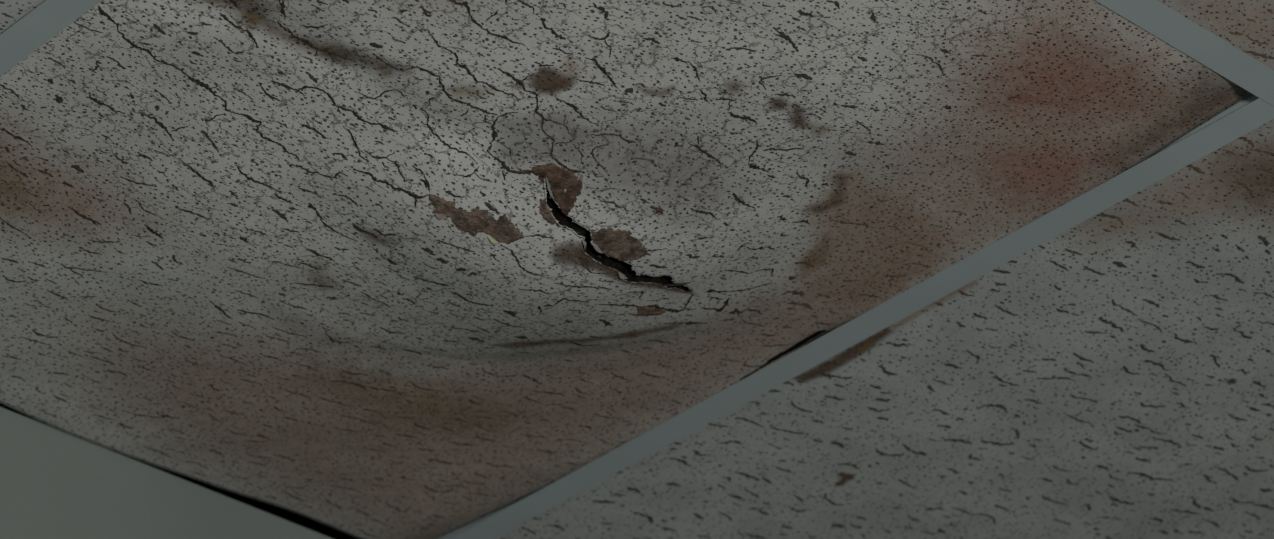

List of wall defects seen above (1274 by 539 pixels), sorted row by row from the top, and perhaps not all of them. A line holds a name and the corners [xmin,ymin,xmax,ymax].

water stain [294,39,391,69]
crack [916,49,988,74]
crack [1223,134,1274,207]
spalling [428,194,524,245]
crack [0,0,967,538]
spalling [590,228,650,261]
crack [500,164,1274,539]